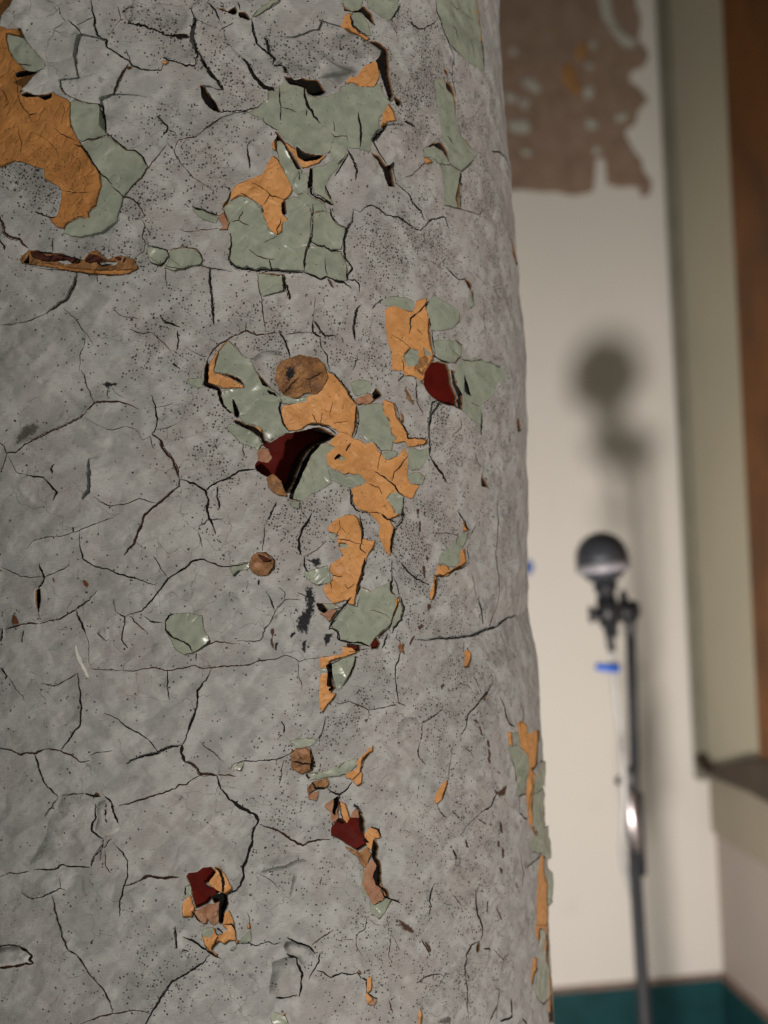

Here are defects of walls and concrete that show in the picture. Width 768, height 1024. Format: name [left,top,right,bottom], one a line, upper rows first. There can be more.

peeling [0,0,158,237]
crack [53,0,361,371]
peeling [123,0,485,330]
crack [335,150,450,239]
crack [0,275,330,1024]
peeling [187,295,505,712]
crack [319,455,516,764]
crack [399,375,462,483]
peeling [182,867,251,956]
peeling [290,738,401,918]
crack [418,882,527,1024]
peeling [500,697,554,1012]